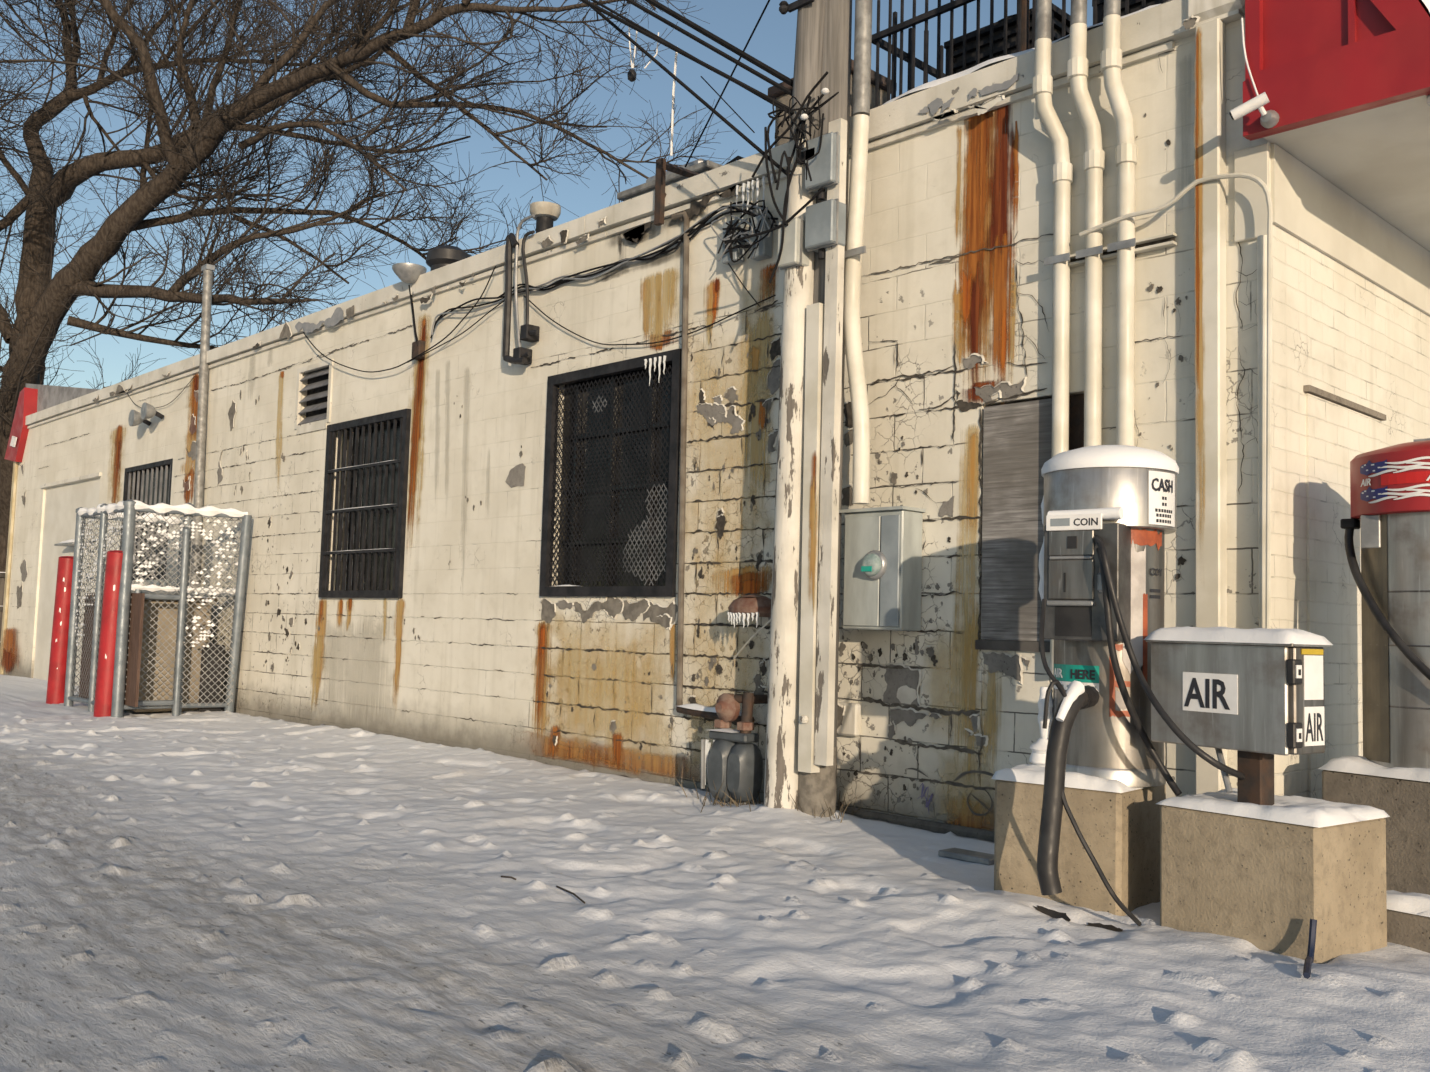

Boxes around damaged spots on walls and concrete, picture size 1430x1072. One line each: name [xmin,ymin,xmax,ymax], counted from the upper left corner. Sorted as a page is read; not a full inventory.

peeling [919,73,1019,122]
corrosion [953,104,1019,403]
corrosion [1195,28,1205,529]
corrosion [111,425,126,503]
corrosion [408,316,429,531]
peeling [697,336,781,454]
crack [840,232,1053,790]
peeling [956,376,1028,412]
crack [1235,242,1258,494]
corrosion [534,621,560,756]
peeling [687,640,767,755]
peeling [838,617,942,779]